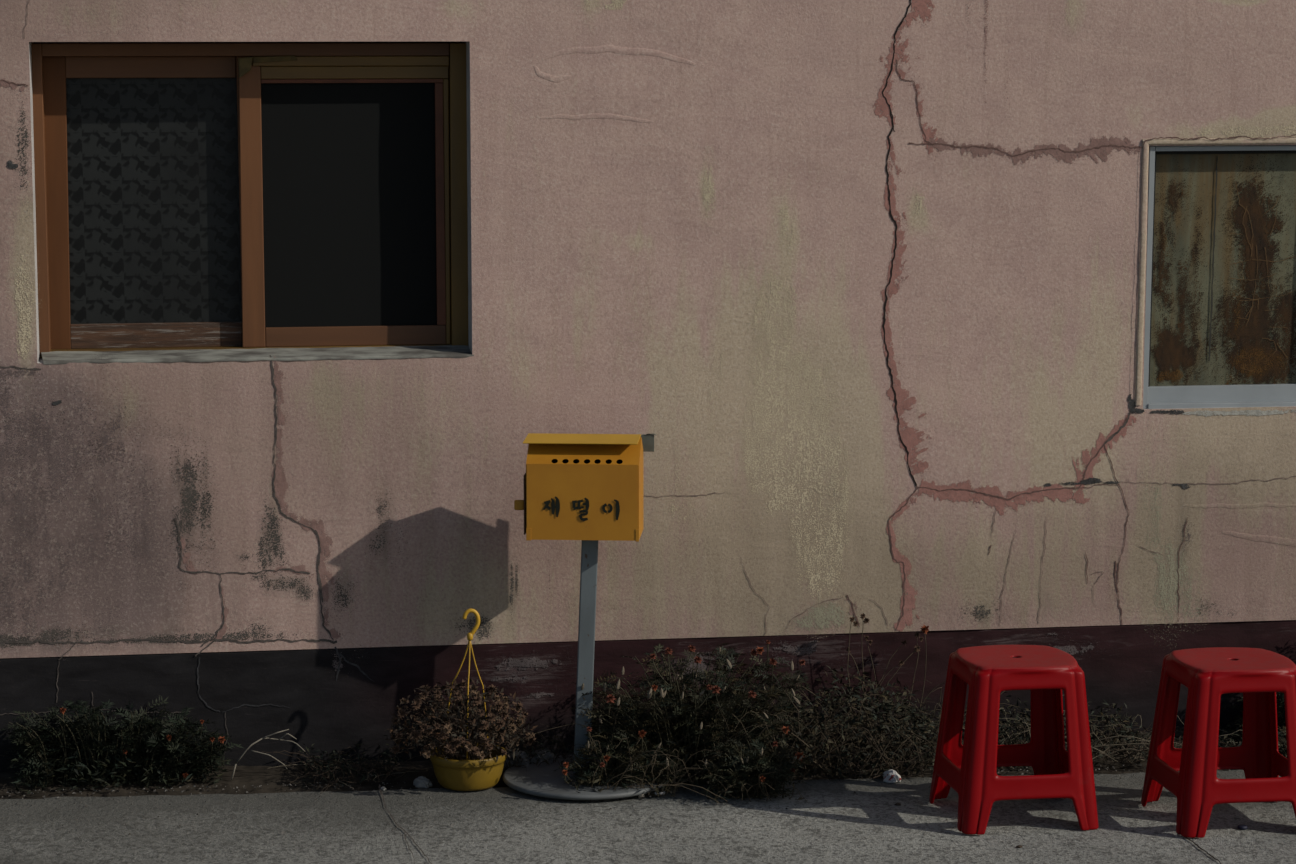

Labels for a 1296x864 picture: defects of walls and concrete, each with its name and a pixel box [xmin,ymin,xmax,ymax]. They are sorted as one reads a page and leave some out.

crack [740,0,1296,635]
corrosion [1150,155,1296,386]
leakage [0,378,215,639]
crack [0,355,373,745]
leakage [238,498,354,613]
flaking render [1045,478,1119,487]